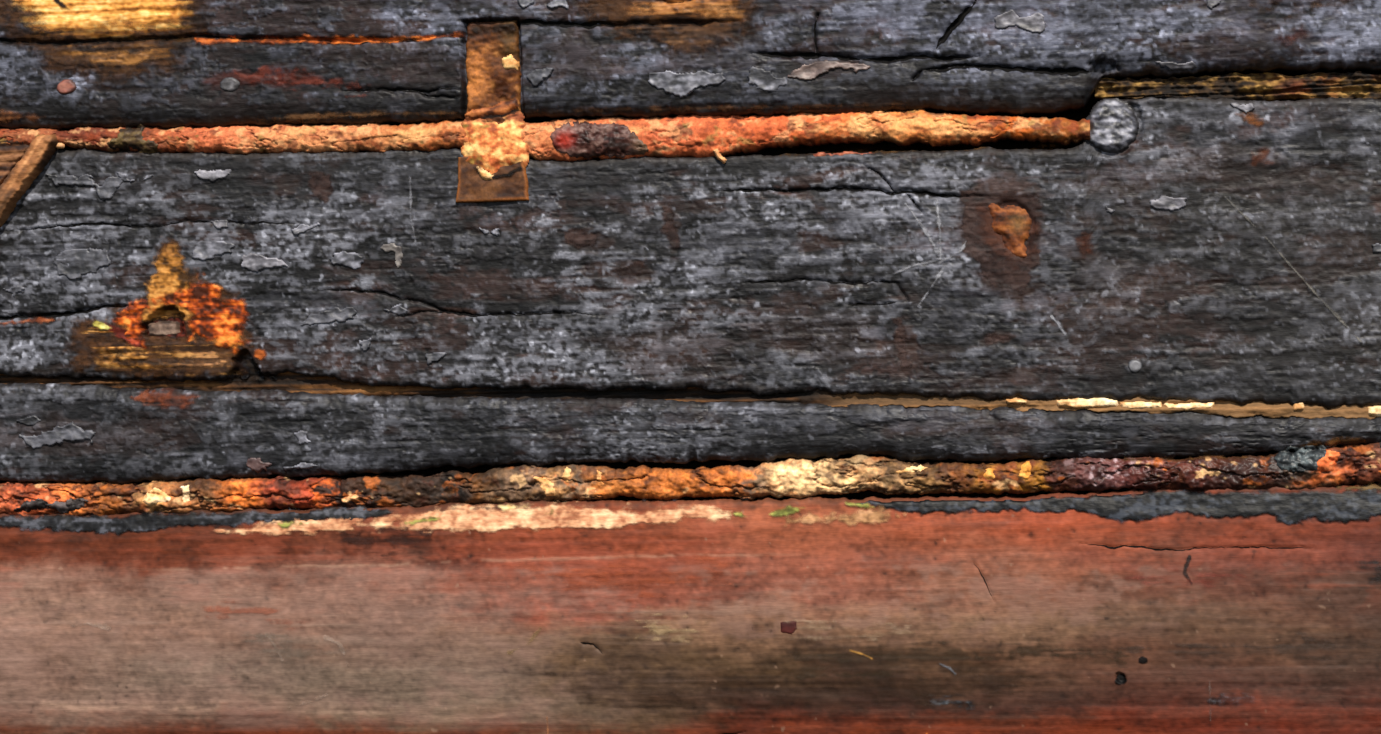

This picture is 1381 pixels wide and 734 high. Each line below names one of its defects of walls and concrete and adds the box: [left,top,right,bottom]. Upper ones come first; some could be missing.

corrosion [0,120,468,155]
corrosion [521,109,1090,162]
corrosion [978,190,1039,259]
corrosion [64,242,266,408]
corrosion [0,441,1381,517]
leakage [1011,646,1091,657]